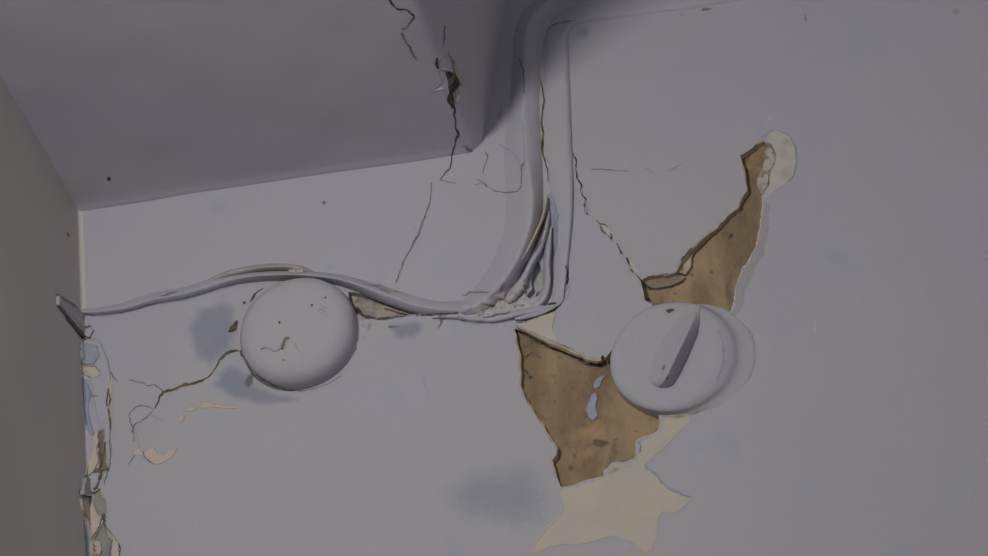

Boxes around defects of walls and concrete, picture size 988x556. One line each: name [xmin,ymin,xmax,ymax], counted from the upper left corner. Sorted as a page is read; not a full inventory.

crack [388,0,417,60]
peeling [57,294,121,556]
crack [128,321,239,450]
spalling [348,291,420,320]
crack [351,20,575,328]
flaking render [433,193,691,554]
crack [568,108,683,281]
flaking render [640,130,797,314]